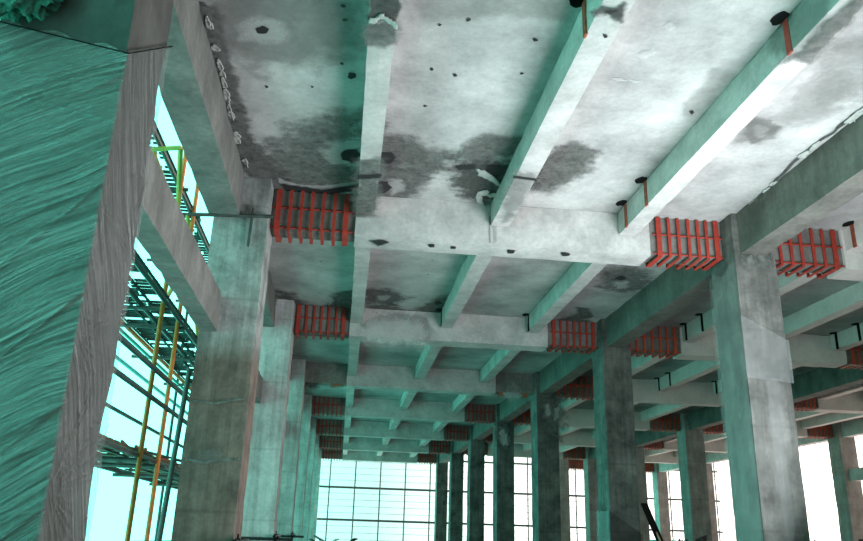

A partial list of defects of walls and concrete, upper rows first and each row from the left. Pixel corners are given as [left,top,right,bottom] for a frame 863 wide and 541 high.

peeling [199,2,214,32]
peeling [210,44,241,144]
leakage [200,6,450,217]
leakage [513,142,597,192]